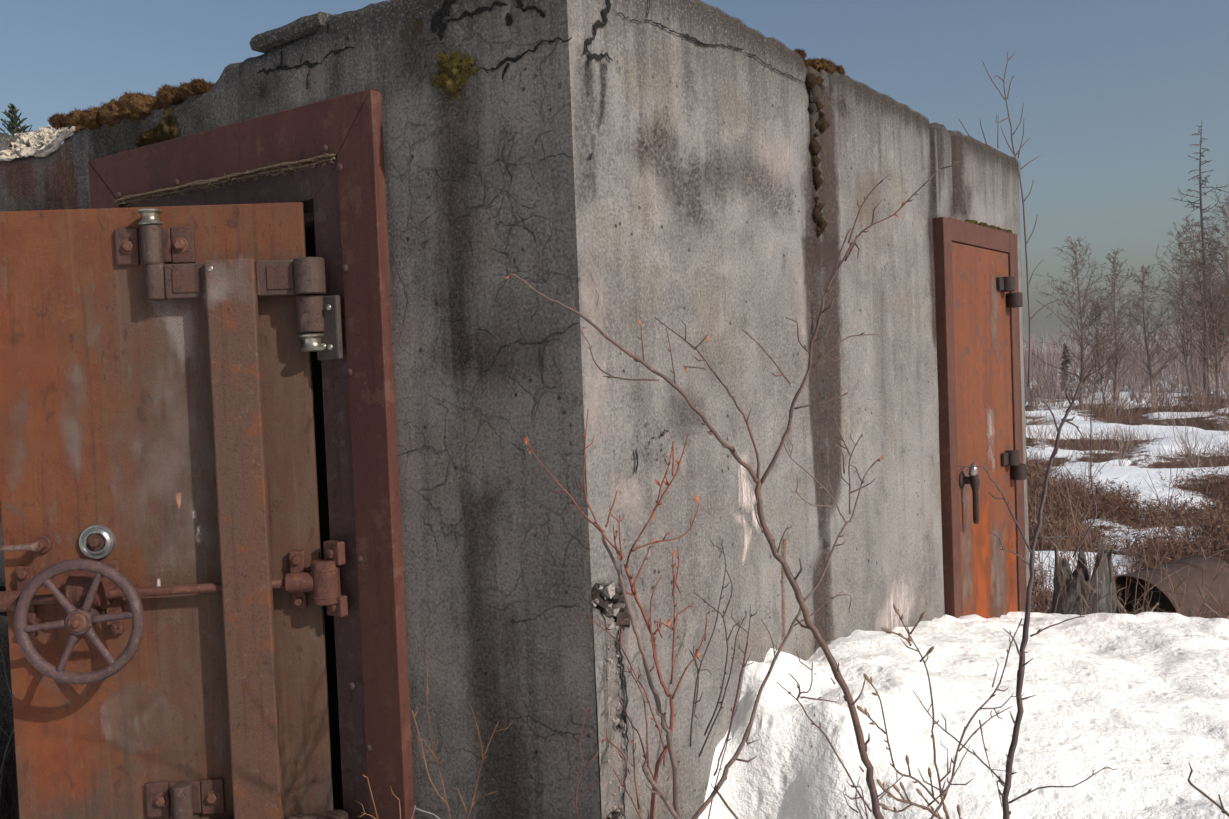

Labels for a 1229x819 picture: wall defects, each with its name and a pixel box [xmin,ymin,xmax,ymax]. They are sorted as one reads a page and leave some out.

crack [257,24,354,89]
crack [477,0,807,85]
spalling [0,124,76,162]
crack [452,117,593,301]
leakage [637,125,791,228]
leakage [858,86,1019,342]
crack [435,273,601,389]
leakage [804,83,846,651]
spalling [591,582,630,819]